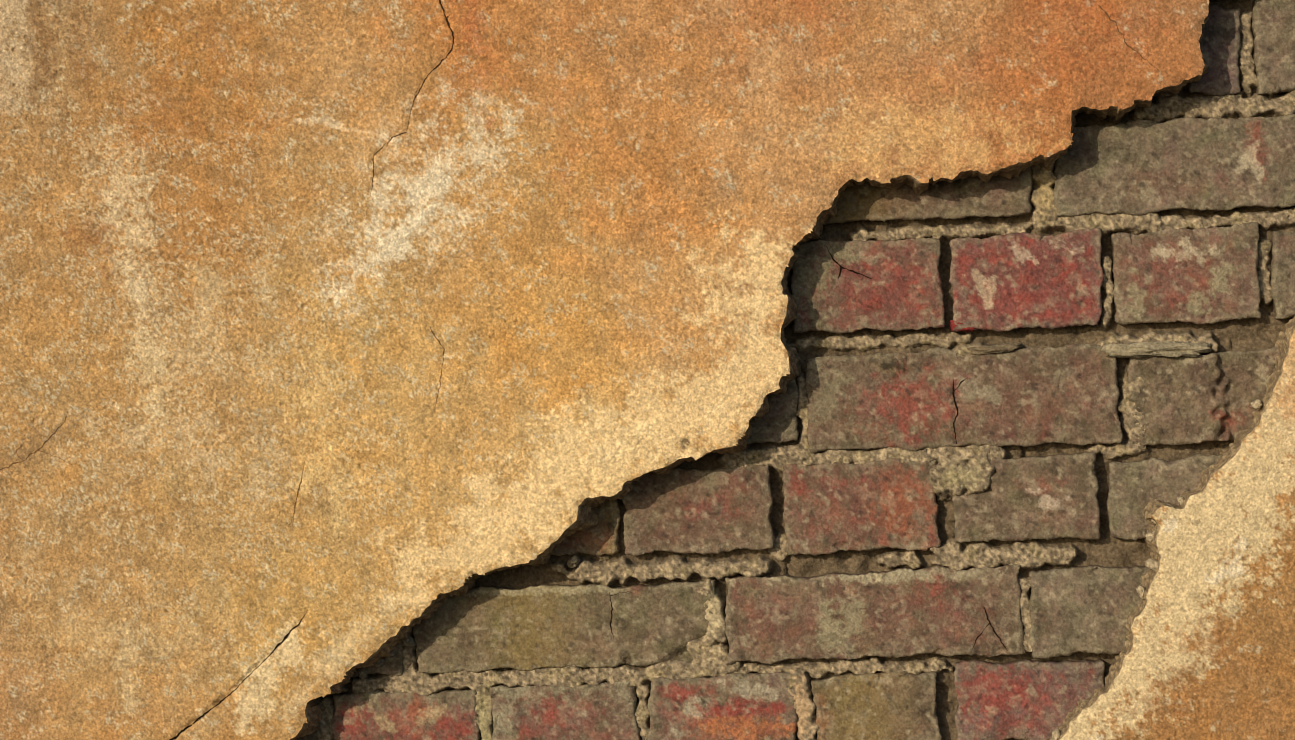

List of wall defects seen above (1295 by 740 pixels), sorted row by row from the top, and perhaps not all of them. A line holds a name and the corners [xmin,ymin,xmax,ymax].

crack [370,0,454,194]
flaking render [290,0,1295,740]
crack [169,610,308,740]
peeling [228,576,418,740]